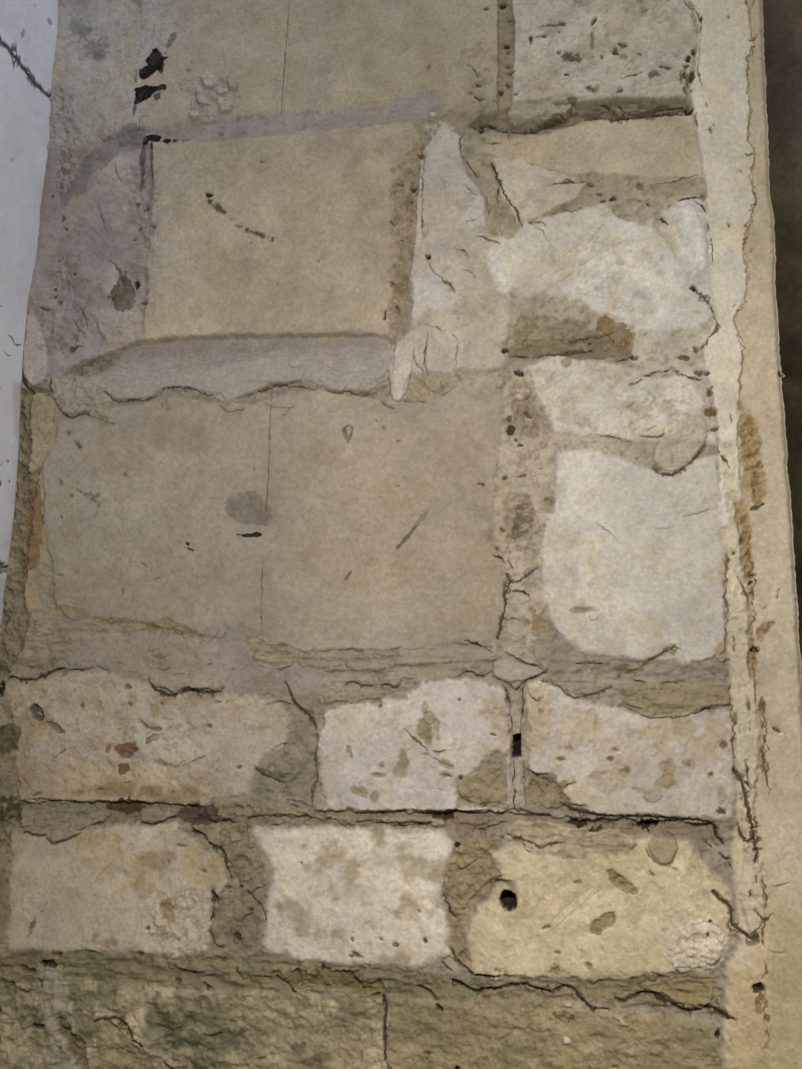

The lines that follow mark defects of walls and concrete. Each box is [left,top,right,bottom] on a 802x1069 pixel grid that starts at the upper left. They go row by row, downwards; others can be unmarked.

crack [281,2,290,114]
crack [420,0,703,291]
crack [22,522,789,1047]
crack [313,967,391,1069]